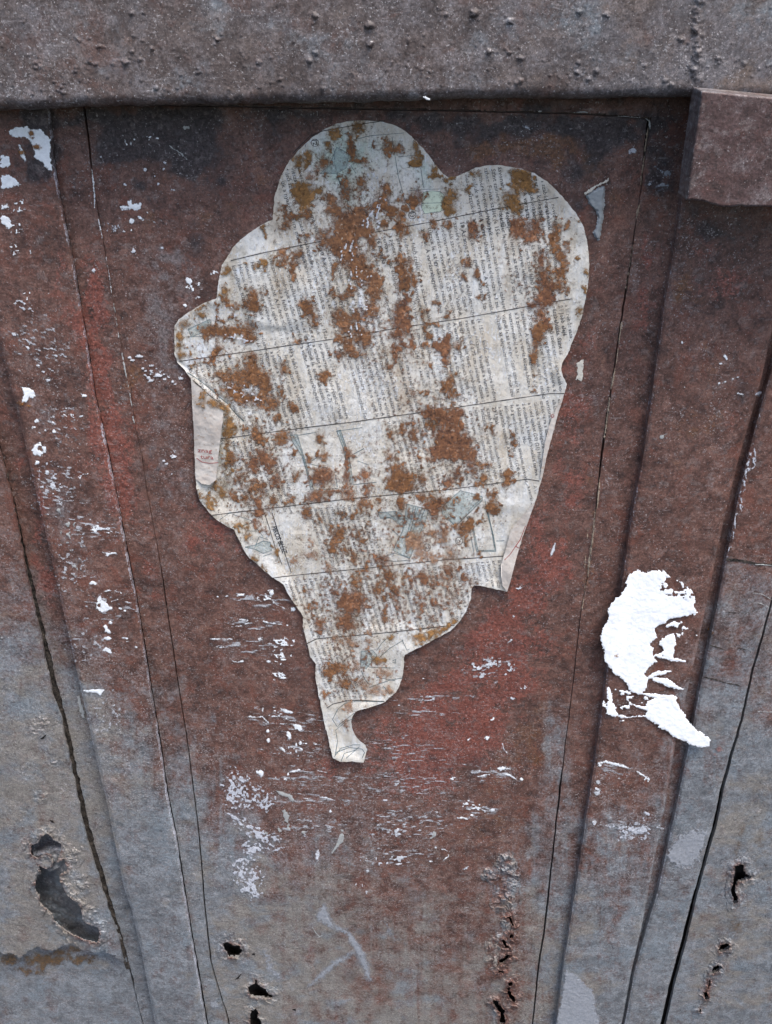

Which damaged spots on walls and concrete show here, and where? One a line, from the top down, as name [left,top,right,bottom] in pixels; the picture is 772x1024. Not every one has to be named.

corrosion [499,168,589,393]
corrosion [175,121,518,731]
crack [598,395,610,480]
crack [726,558,772,566]
crack [3,458,131,969]
corrosion [481,847,522,969]
crack [660,732,740,1024]